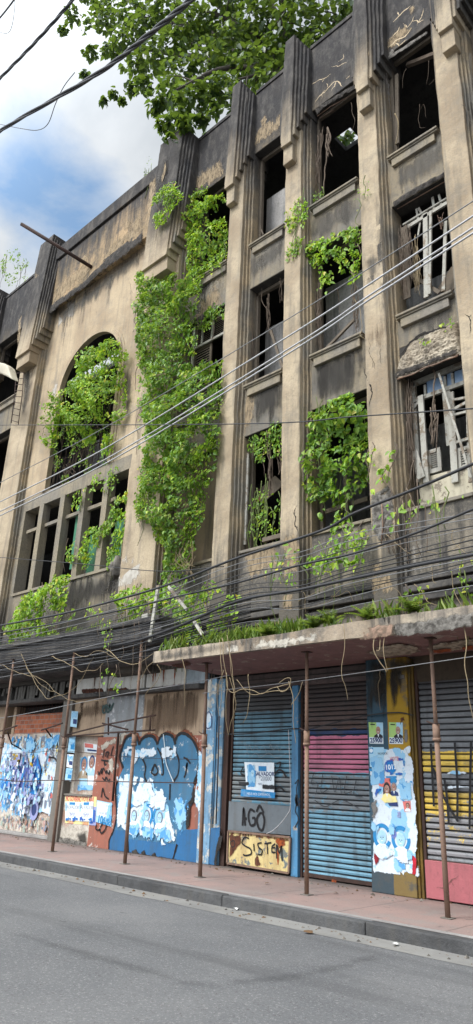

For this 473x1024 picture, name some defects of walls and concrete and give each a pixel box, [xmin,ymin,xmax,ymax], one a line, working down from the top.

crack [388,6,423,48]
crack [313,55,347,101]
peeling [255,115,280,145]
spalling [360,612,473,657]